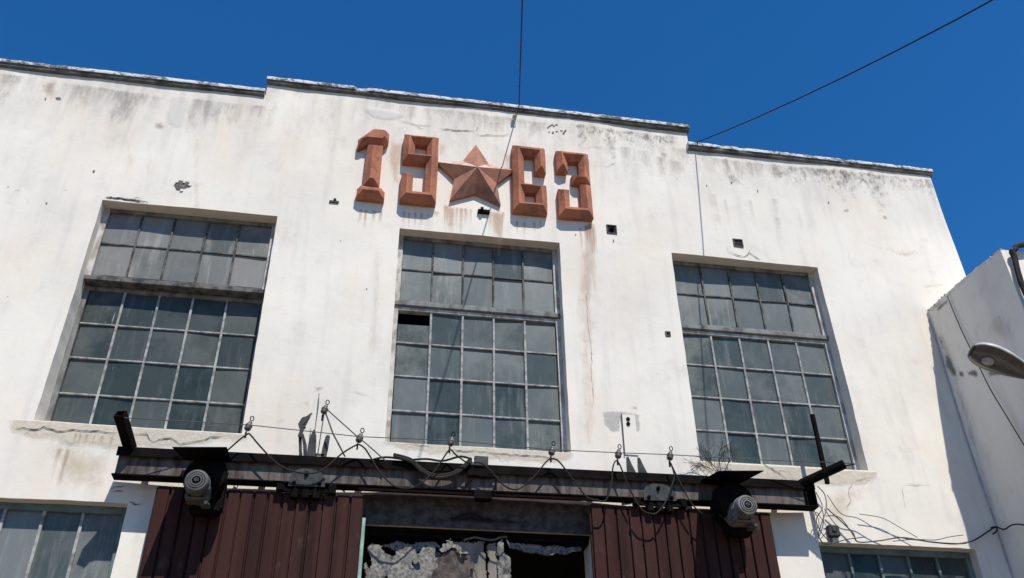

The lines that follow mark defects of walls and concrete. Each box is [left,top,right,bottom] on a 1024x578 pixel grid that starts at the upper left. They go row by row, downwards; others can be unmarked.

corrosion [392,145,400,172]
spalling [173,180,192,191]
crack [21,426,221,447]